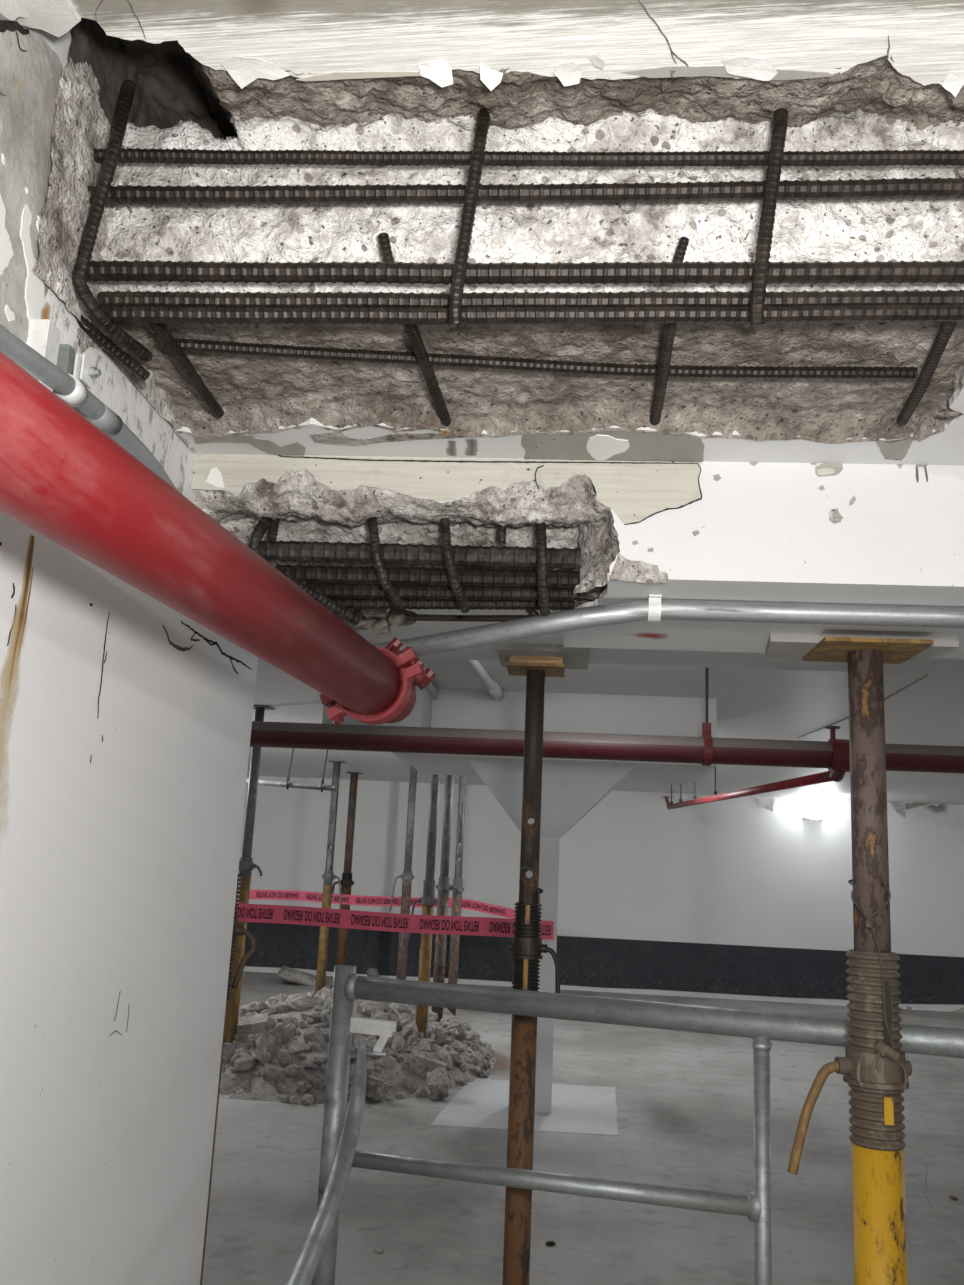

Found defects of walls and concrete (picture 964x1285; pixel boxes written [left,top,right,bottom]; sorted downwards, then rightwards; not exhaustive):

spalling [0,0,964,635]
crack [90,612,110,764]
crack [162,621,252,674]